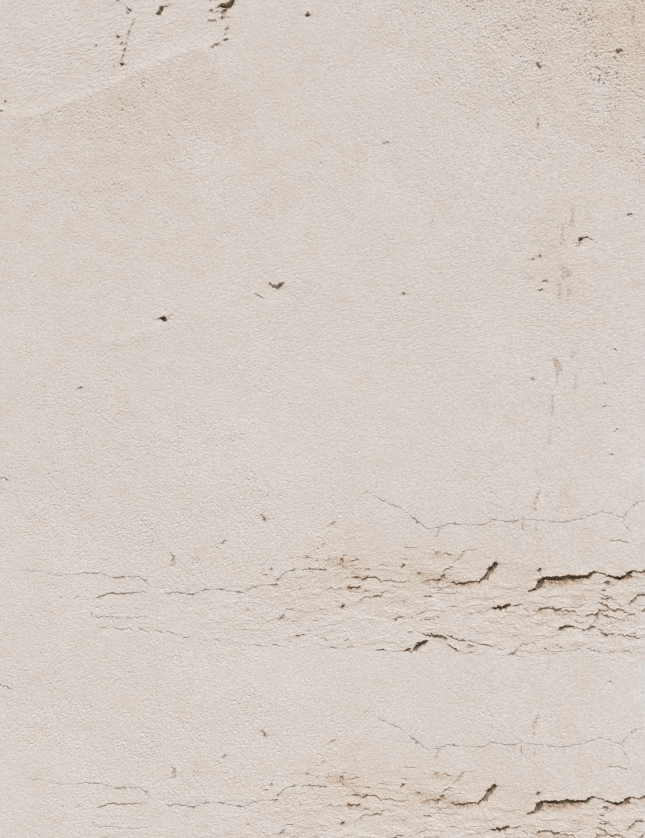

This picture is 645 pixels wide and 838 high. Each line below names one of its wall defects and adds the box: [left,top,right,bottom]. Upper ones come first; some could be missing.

crack [115,0,133,16]
crack [156,3,172,16]
crack [204,0,236,51]
crack [351,491,645,544]
crack [21,566,328,600]
crack [23,777,328,810]